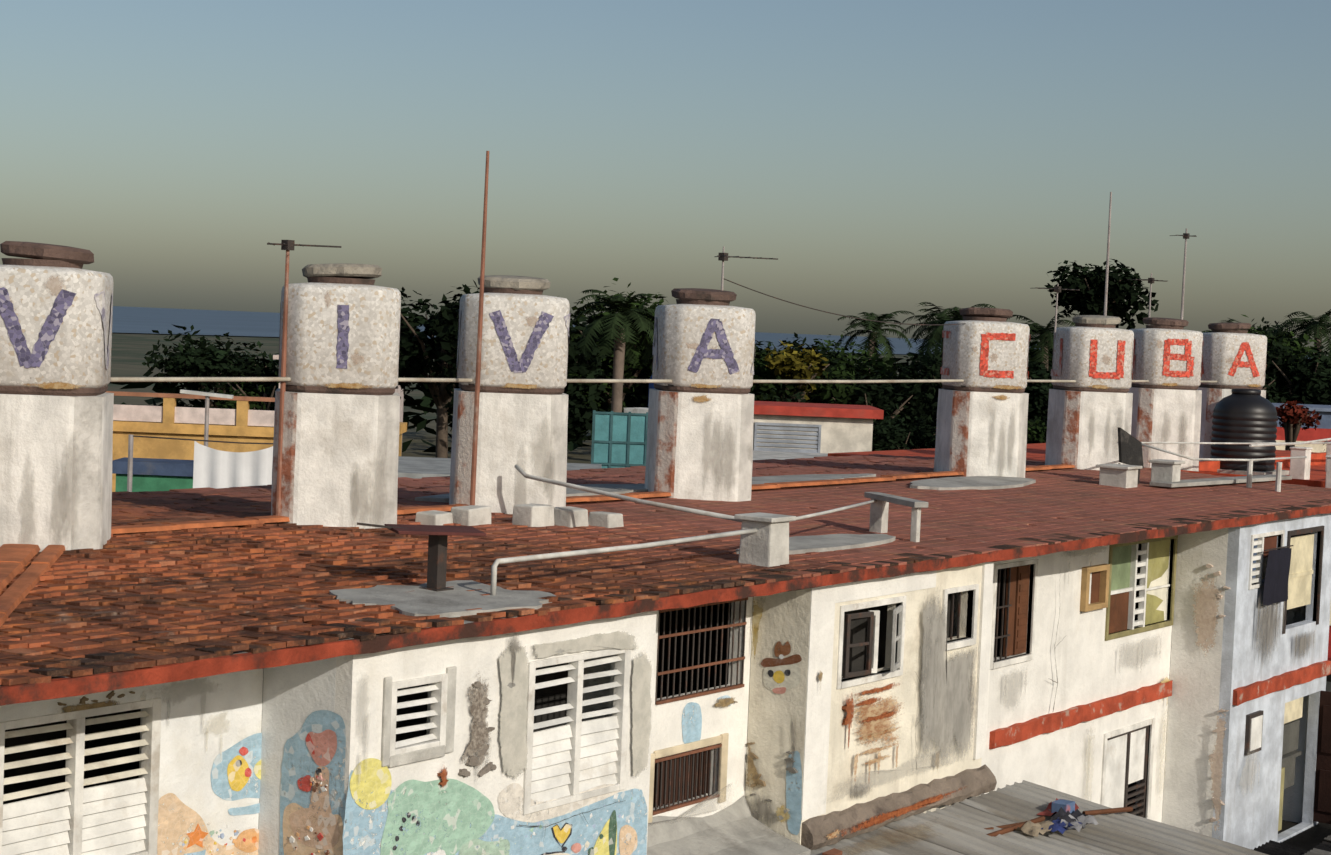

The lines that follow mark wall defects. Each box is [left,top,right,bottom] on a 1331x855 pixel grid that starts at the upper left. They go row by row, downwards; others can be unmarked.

peeling [437,631,652,787]
spalling [853,683,902,784]
water stain [921,598,940,728]
peeling [920,600,977,759]
peeling [1192,564,1231,652]